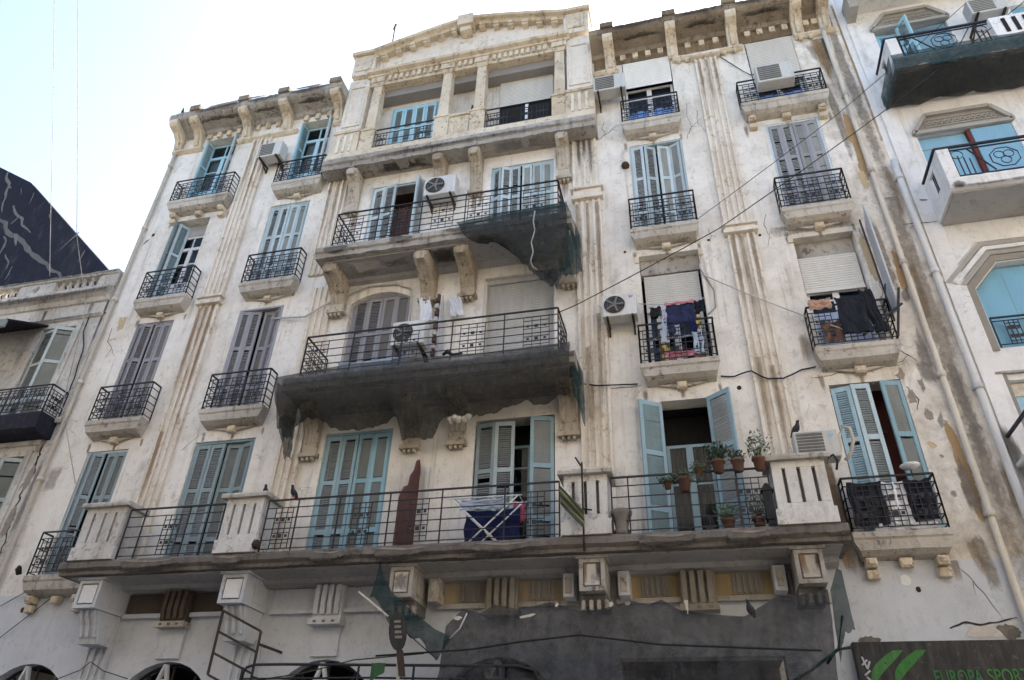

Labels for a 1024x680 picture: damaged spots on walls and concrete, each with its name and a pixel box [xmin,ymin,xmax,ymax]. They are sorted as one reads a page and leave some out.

flaking render [842,111,871,189]
leakage [809,17,1024,566]
spalling [446,414,472,424]
flaking render [894,338,985,521]
crack [0,445,43,554]